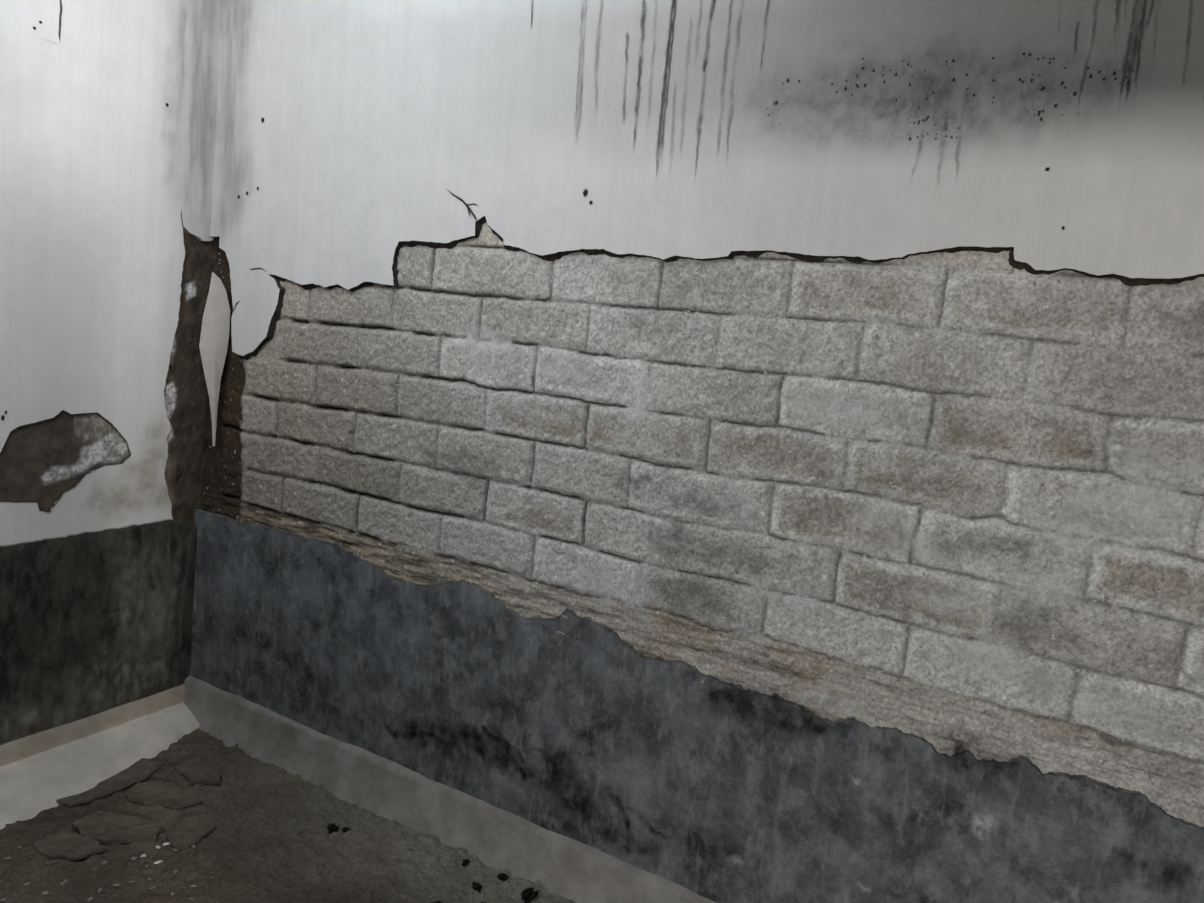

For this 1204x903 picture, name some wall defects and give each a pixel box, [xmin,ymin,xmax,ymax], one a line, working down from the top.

damp [658,23,674,145]
spalling [0,410,131,512]
spalling [164,216,1204,828]
damp [387,719,630,851]